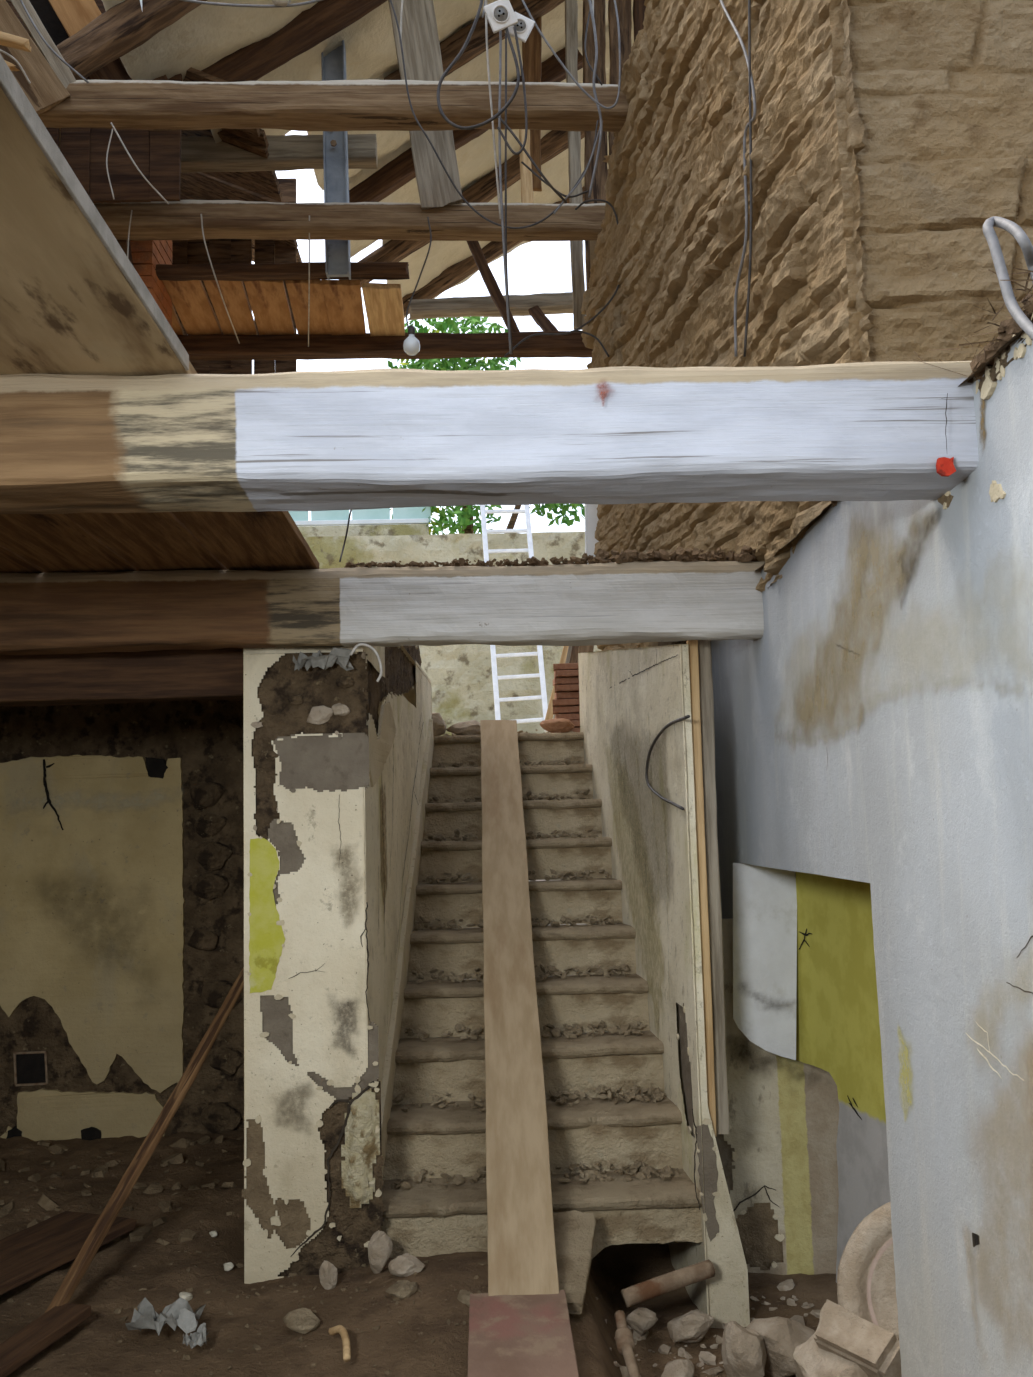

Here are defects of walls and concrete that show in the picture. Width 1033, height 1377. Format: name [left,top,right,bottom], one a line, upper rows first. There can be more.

damp [797,529,913,729]
flaking render [145,757,168,779]
flaking render [242,645,422,1277]
crack [1006,936,1033,994]
spalling [0,1125,22,1139]
spalling [81,1127,102,1140]
flaking render [676,1003,739,1241]
crack [290,1081,374,1257]
flaking render [735,1203,785,1270]